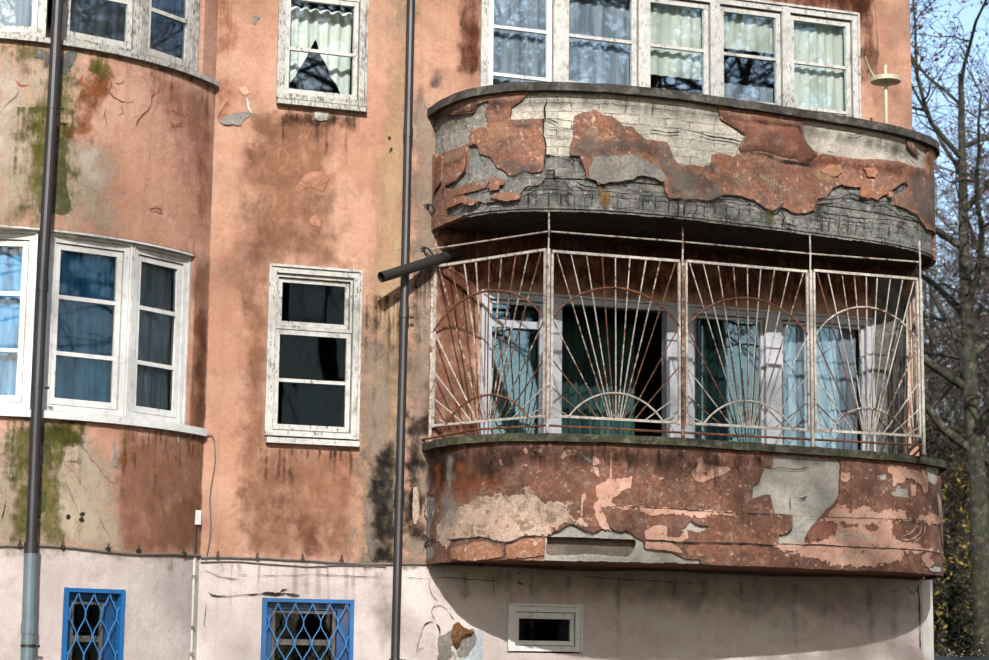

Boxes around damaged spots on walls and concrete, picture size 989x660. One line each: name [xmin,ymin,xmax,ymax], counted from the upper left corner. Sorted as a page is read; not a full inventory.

water stain [0,47,114,228]
crack [100,71,159,127]
peeling [219,87,253,126]
water stain [460,0,480,73]
flaking render [418,92,933,259]
water stain [773,0,878,80]
water stain [0,264,208,552]
water stain [243,63,914,568]
flaking render [869,277,907,454]
peeling [412,449,737,564]
peeling [753,454,944,572]
flaking render [422,621,483,660]